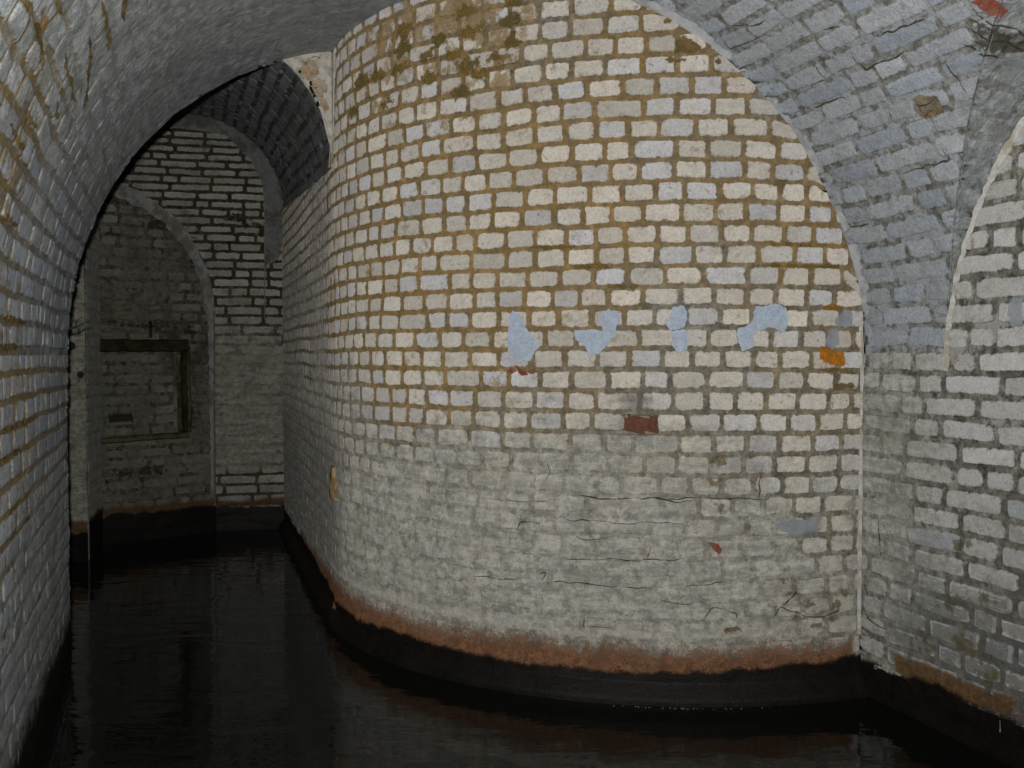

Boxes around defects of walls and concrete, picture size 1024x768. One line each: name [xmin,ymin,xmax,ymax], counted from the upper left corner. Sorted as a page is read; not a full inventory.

damp [353,0,522,102]
damp [665,35,701,63]
peeling [507,310,539,376]
peeling [574,309,619,355]
peeling [666,306,688,353]
peeling [737,304,788,351]
crack [486,464,762,619]
crack [774,592,840,618]
damp [69,505,1024,768]